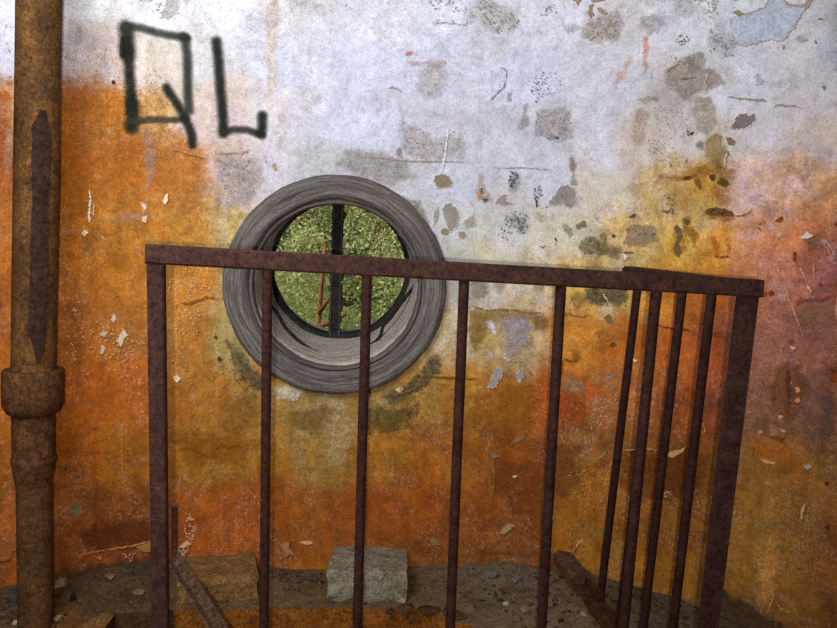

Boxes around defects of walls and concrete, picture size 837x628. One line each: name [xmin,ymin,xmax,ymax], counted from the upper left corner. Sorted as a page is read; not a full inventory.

peeling [567,0,617,41]
spalling [729,0,817,49]
rust [0,76,12,151]
peeling [535,109,572,142]
peeling [666,52,757,165]
spalling [433,173,453,189]
spalling [534,158,578,221]
spalling [562,214,659,247]
rust [673,217,698,257]
rust [772,363,808,420]